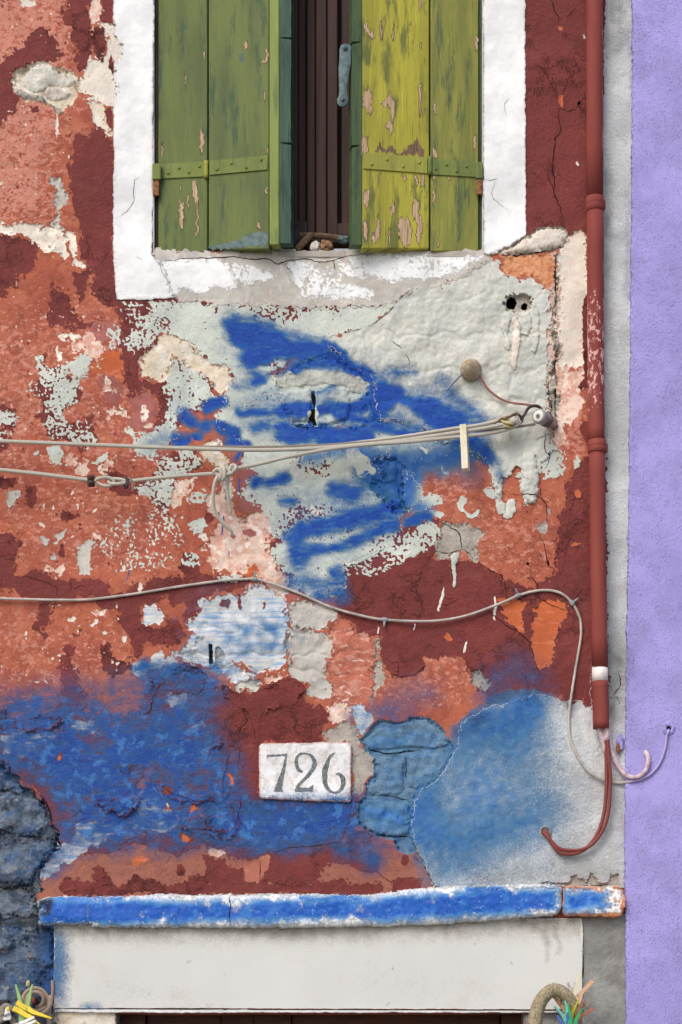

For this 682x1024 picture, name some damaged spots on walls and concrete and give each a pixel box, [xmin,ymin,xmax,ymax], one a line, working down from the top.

peeling [0,0,486,459]
crack [137,254,373,283]
crack [505,65,576,306]
peeling [498,0,588,480]
peeling [0,441,624,1007]
spalling [35,1000,56,1024]